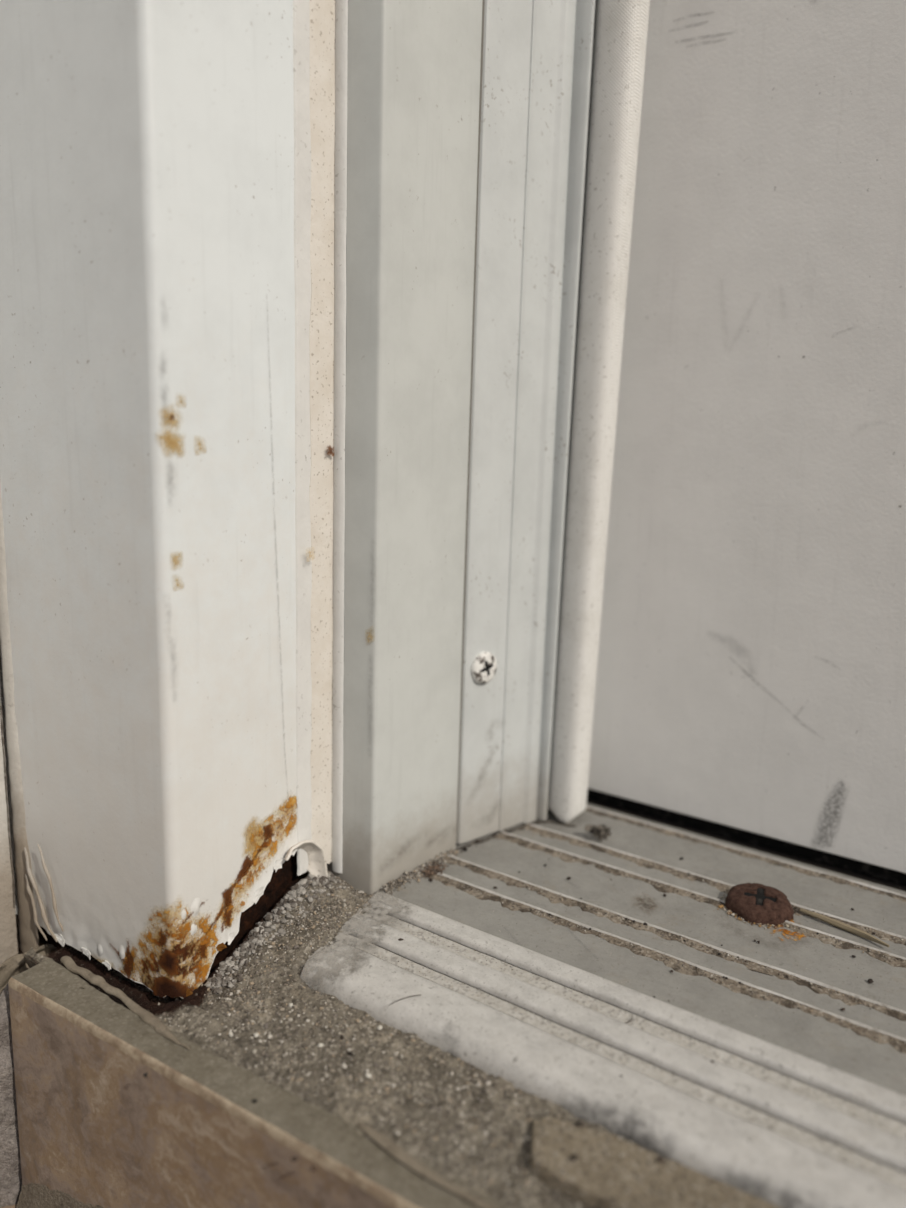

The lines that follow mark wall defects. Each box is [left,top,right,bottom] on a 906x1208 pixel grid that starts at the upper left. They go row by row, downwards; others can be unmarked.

corrosion [160,400,182,454]
peeling [273,849,297,872]
corrosion [22,796,299,1015]
peeling [252,886,264,904]
peeling [216,932,236,951]